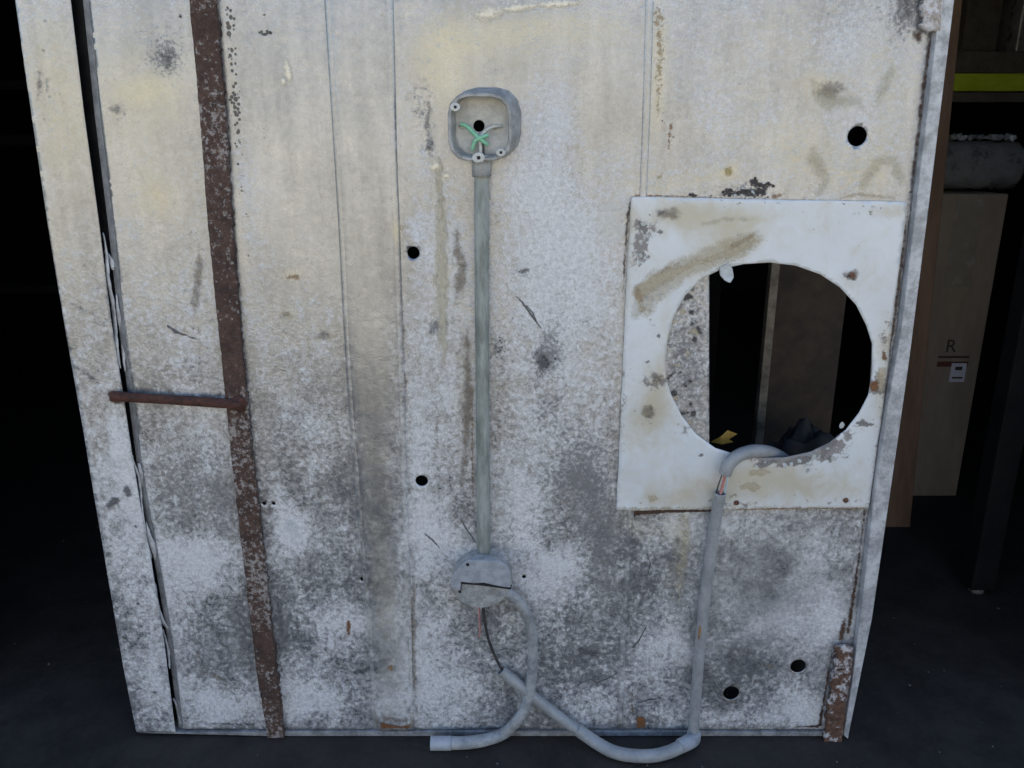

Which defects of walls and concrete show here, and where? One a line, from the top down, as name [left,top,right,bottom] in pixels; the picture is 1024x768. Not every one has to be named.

corrosion [654,9,665,113]
peeling [689,177,775,197]
corrosion [190,0,286,738]
peeling [754,419,874,473]